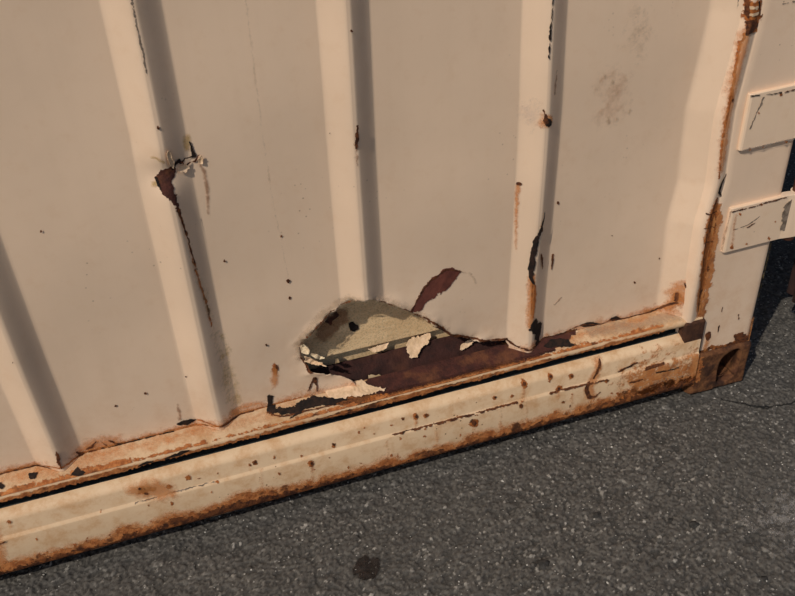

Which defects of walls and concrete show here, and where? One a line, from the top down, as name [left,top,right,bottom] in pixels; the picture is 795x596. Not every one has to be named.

corrosion [696,0,763,318]
corrosion [155,166,212,327]
peeling [300,345,327,367]
peeling [325,374,386,399]
corrosion [0,283,753,575]
peeling [368,342,389,353]
peeling [406,267,462,359]